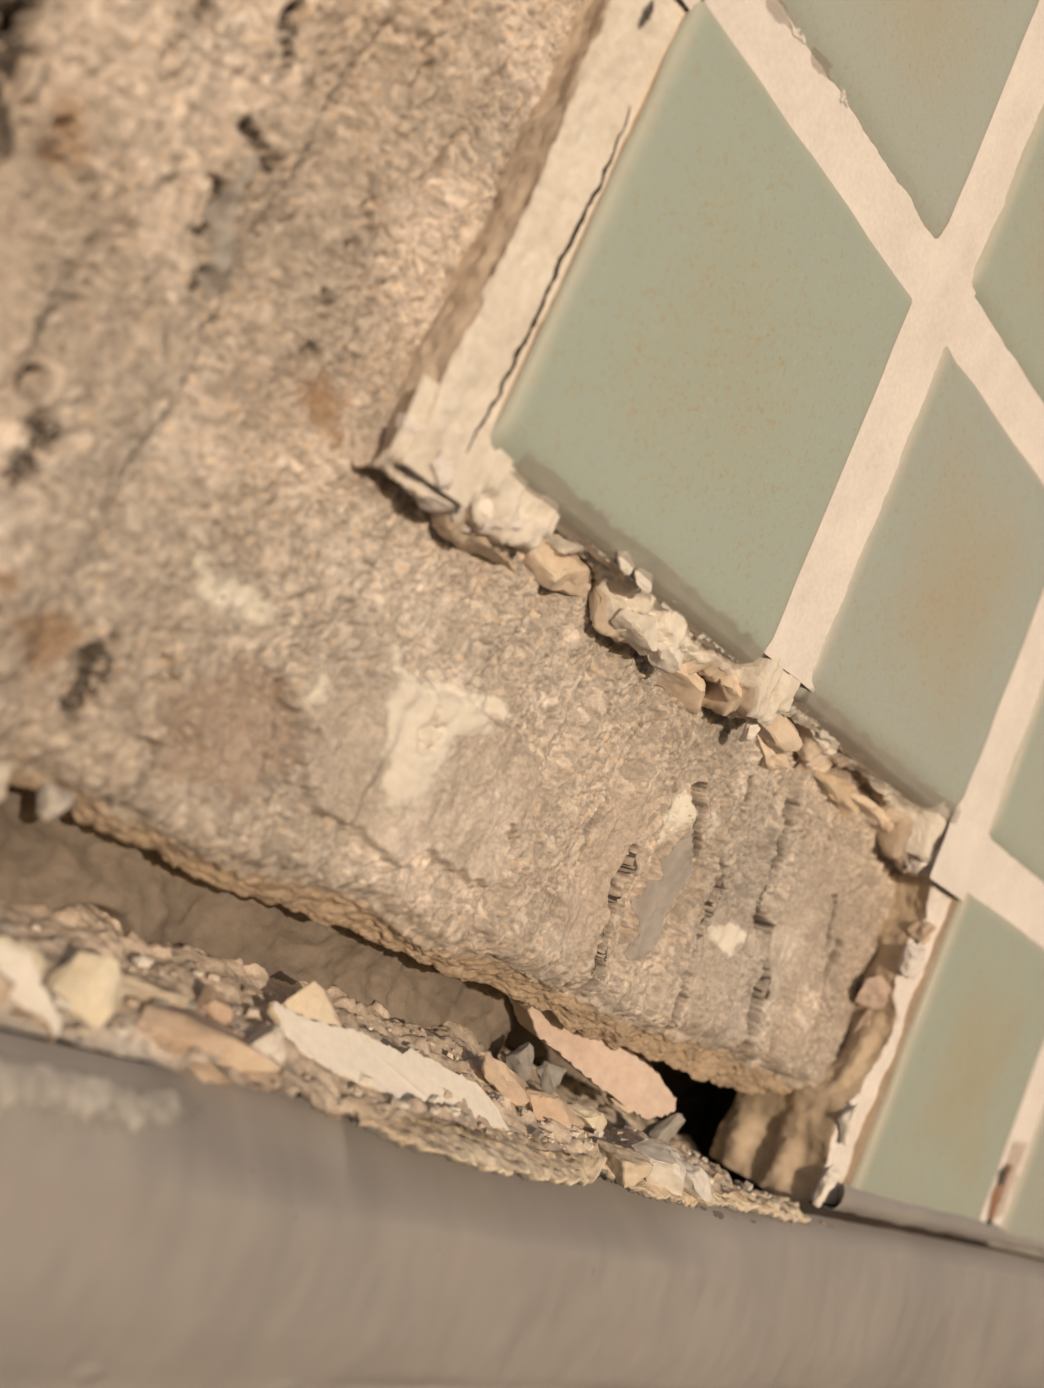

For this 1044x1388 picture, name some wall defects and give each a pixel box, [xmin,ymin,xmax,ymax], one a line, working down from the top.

spalling [0,0,955,1201]
rust [988,1164,1012,1225]